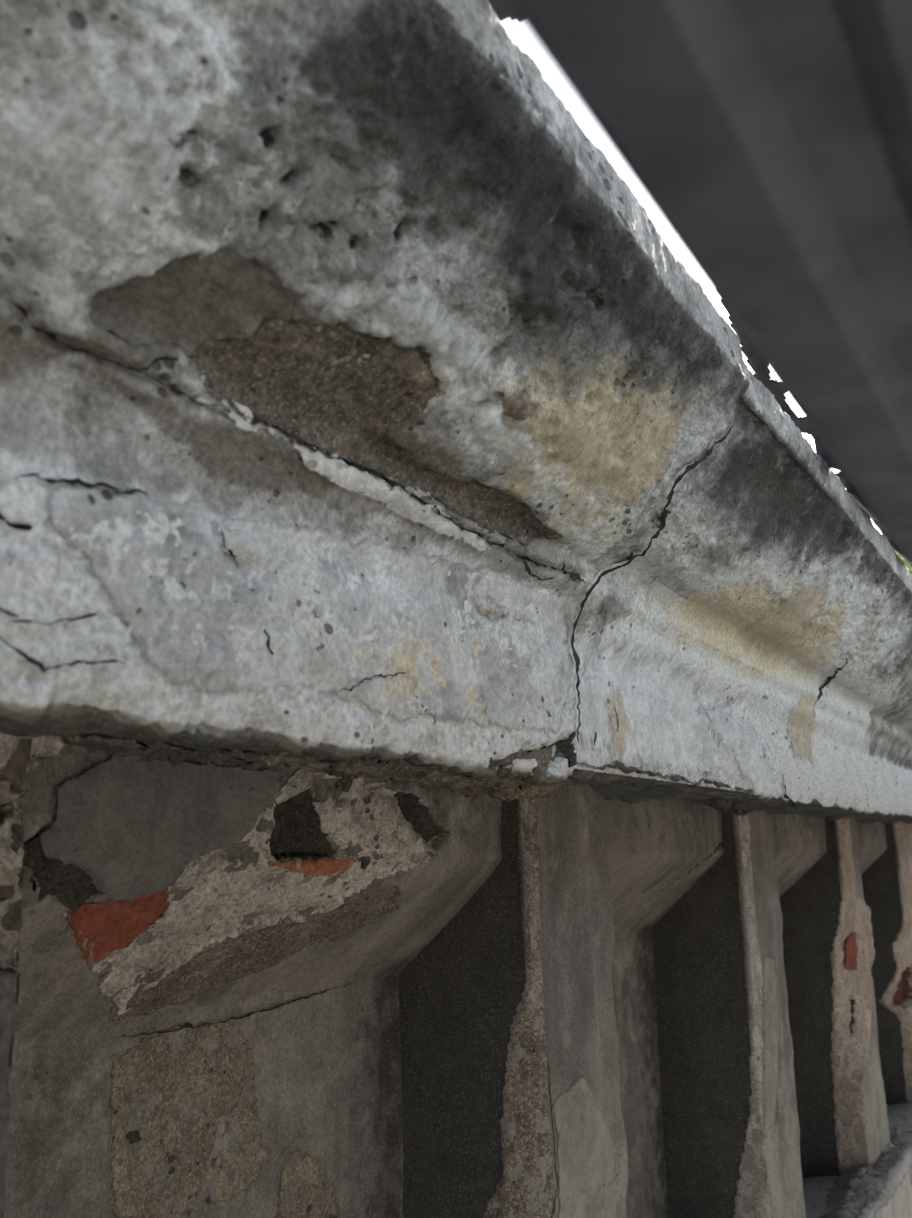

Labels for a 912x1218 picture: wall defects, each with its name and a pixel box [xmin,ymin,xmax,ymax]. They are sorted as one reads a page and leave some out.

spalling [90,126,563,551]
crack [0,295,733,744]
leakage [465,388,540,455]
peeling [0,484,617,1218]
crack [782,774,796,807]
spalling [831,817,912,1175]